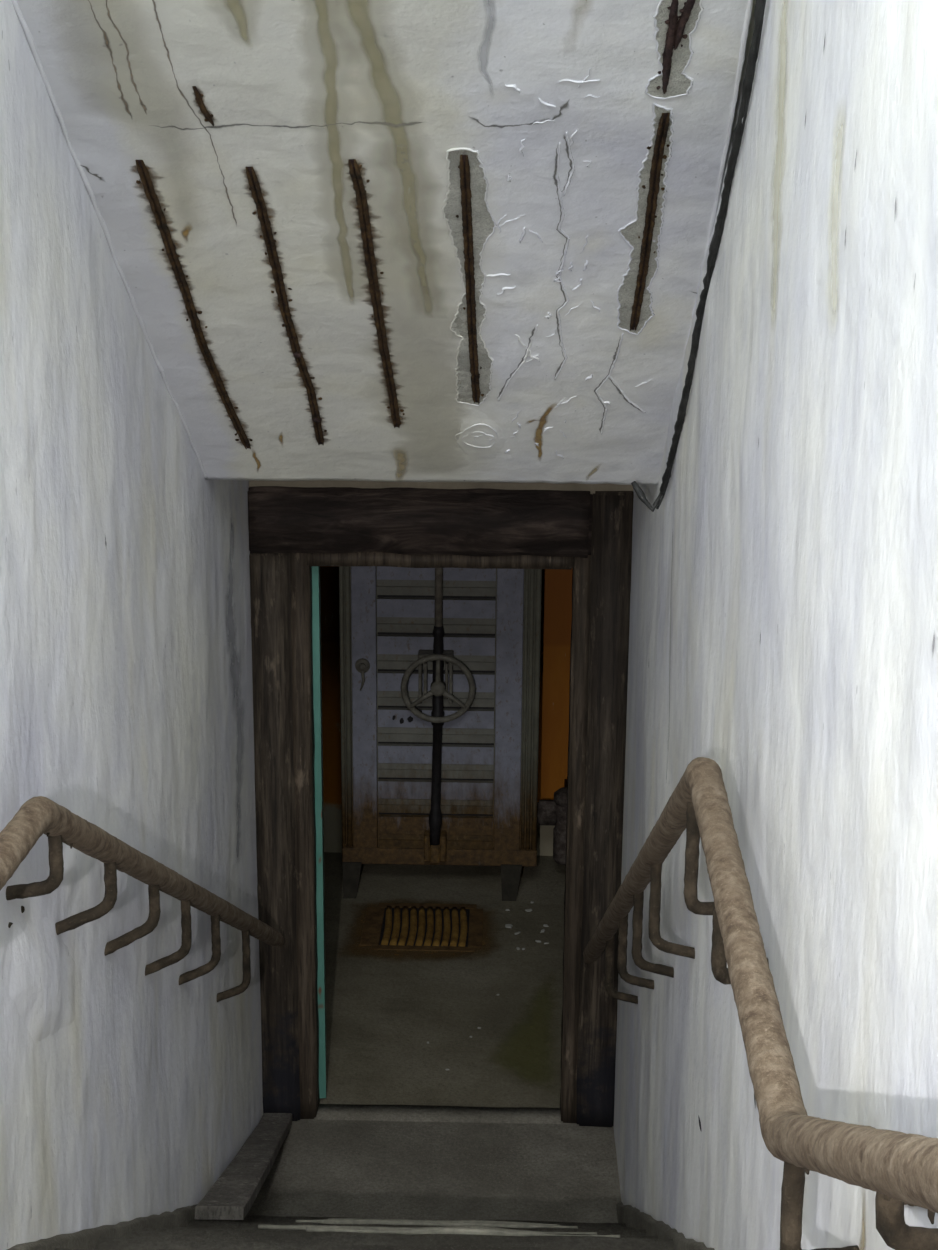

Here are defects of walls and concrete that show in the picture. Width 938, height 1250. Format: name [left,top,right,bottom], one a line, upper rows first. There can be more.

leakage [226,0,247,39]
crack [88,0,421,223]
leakage [315,0,353,298]
leakage [348,0,431,311]
spalling [442,148,543,406]
crack [472,102,575,401]
peeling [558,67,600,98]
crack [594,333,646,434]
spalling [617,0,704,335]